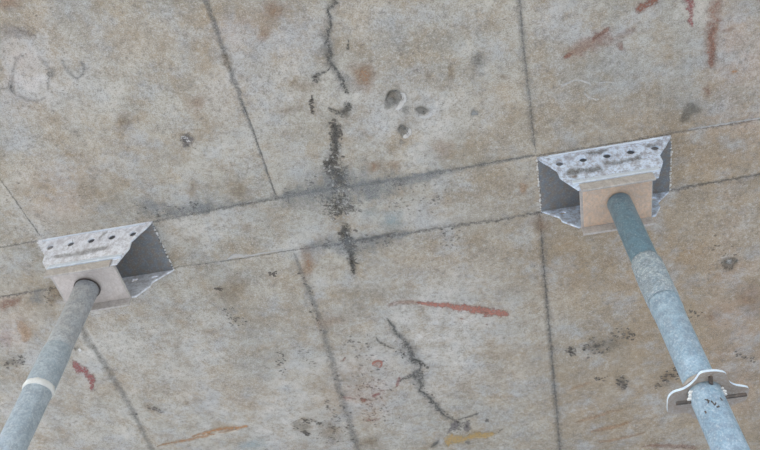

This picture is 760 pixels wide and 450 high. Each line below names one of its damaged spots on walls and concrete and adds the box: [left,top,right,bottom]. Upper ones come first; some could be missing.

rust [707,1,721,66]
crack [309,0,361,273]
spalling [398,125,412,139]
rust [389,301,509,325]
rust [72,361,95,389]
crack [376,319,478,420]